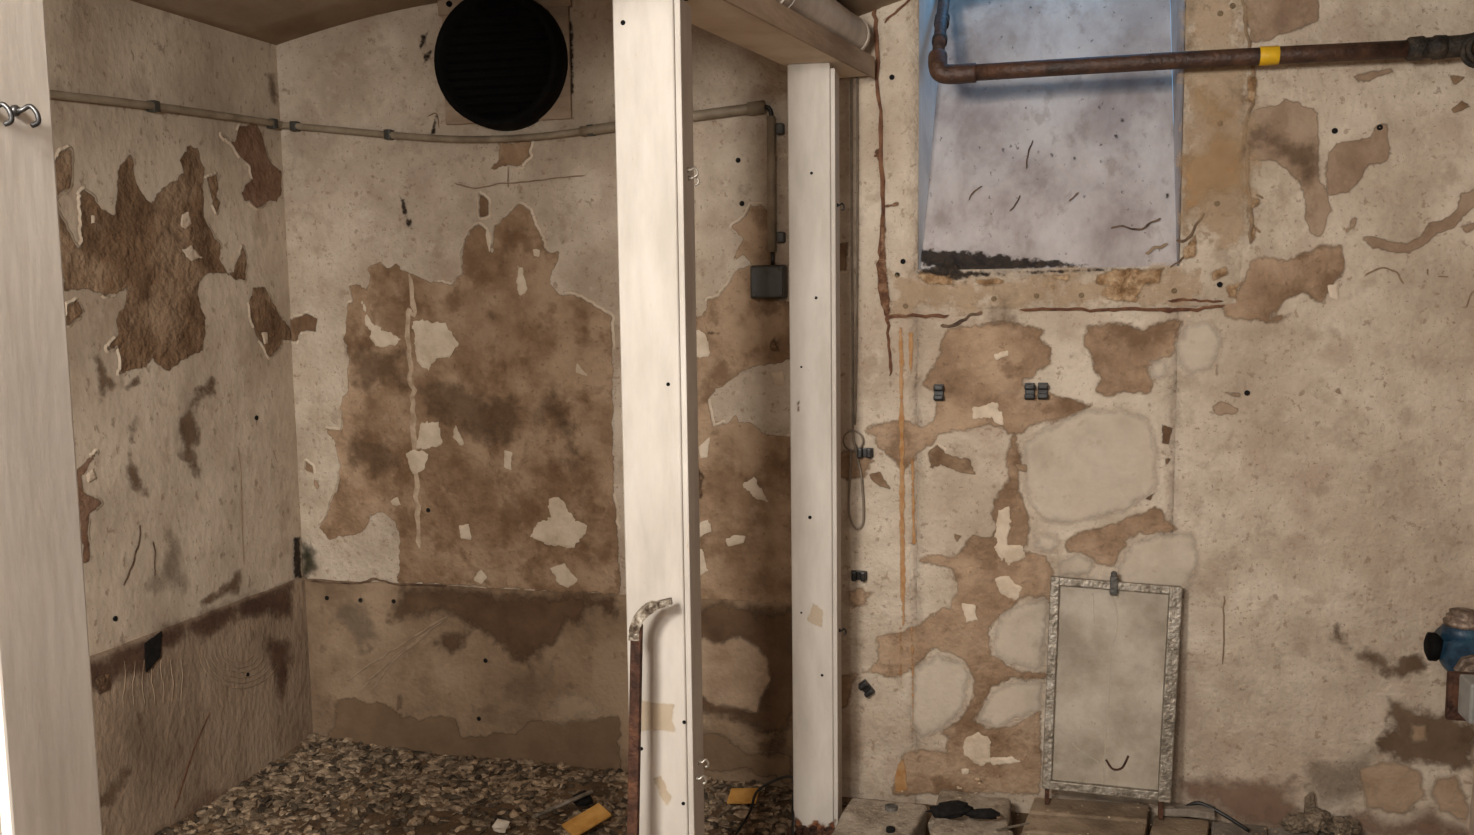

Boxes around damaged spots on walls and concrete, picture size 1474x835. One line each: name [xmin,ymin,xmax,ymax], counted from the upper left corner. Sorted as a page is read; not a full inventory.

peeling [55,144,317,377]
peeling [219,123,282,211]
peeling [1212,75,1474,323]
peeling [77,448,104,563]
leakage [90,537,315,688]
leakage [268,641,288,698]
peeling [303,191,621,595]
leakage [394,588,618,663]
peeling [696,202,792,603]
peeling [841,319,1182,796]